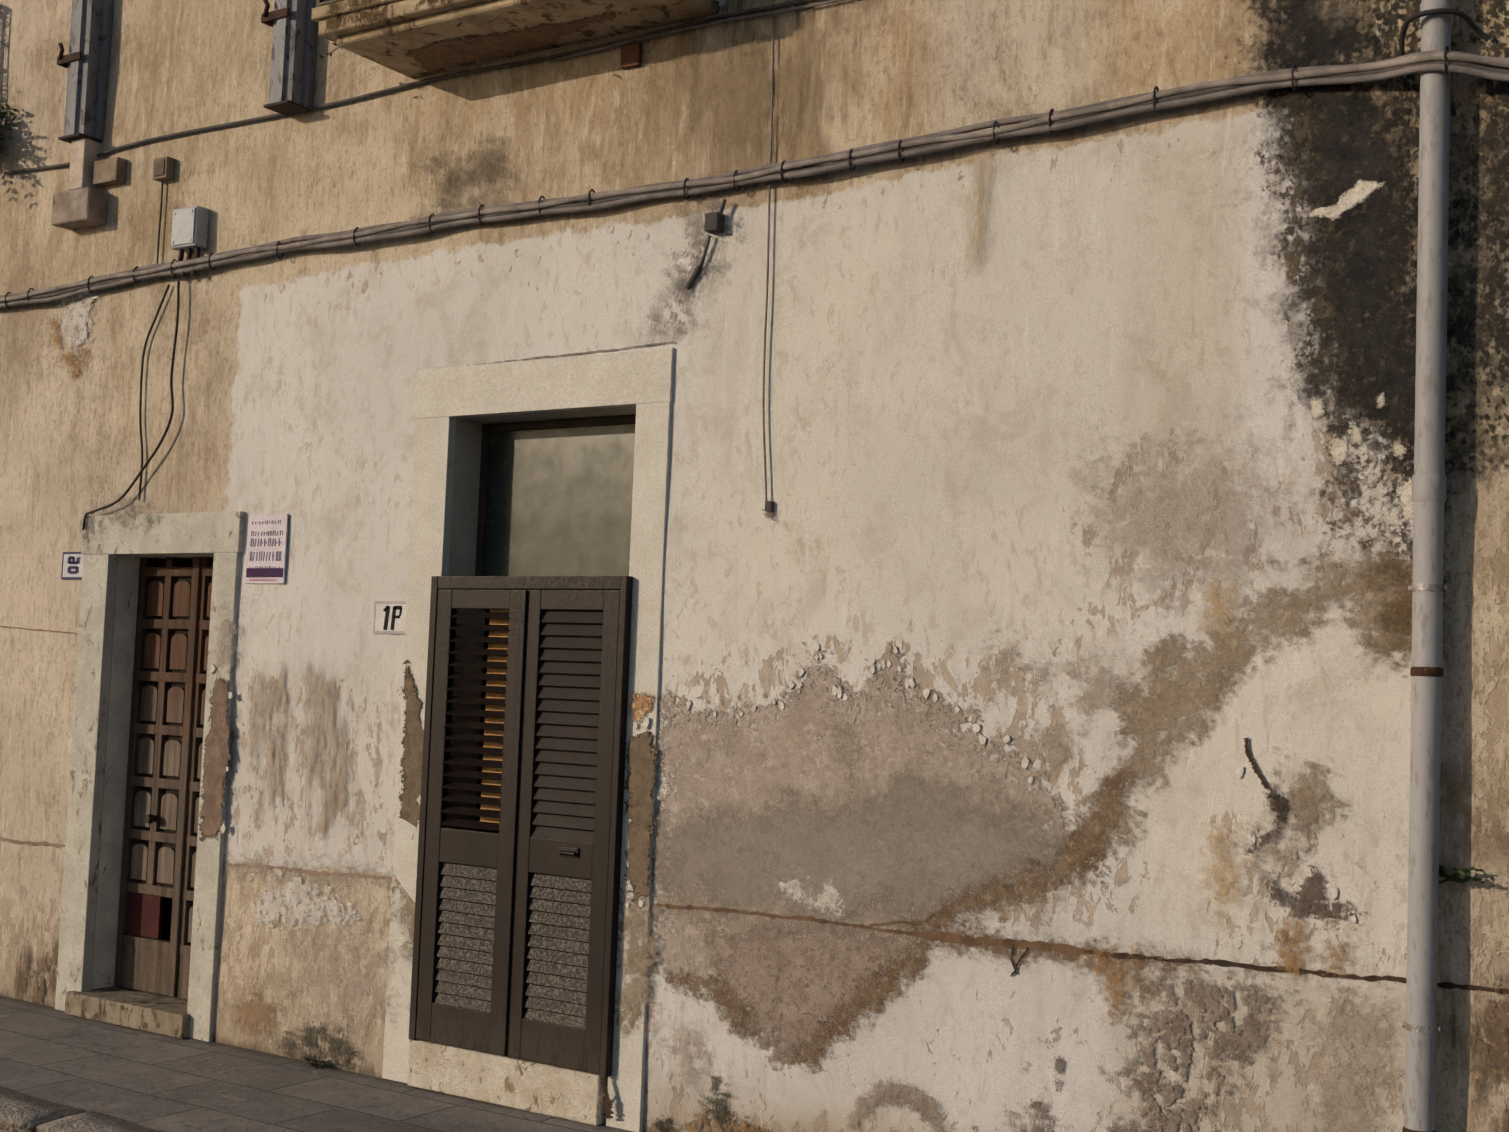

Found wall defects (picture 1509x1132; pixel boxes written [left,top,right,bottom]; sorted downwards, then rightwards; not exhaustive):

leakage [1249,0,1422,71]
leakage [1451,0,1509,58]
leakage [418,141,516,219]
leakage [1445,78,1509,478]
leakage [925,73,1420,932]
spalling [197,619,235,842]
spalling [398,660,424,840]
flaking render [614,635,1132,1078]
crack [652,891,1509,994]